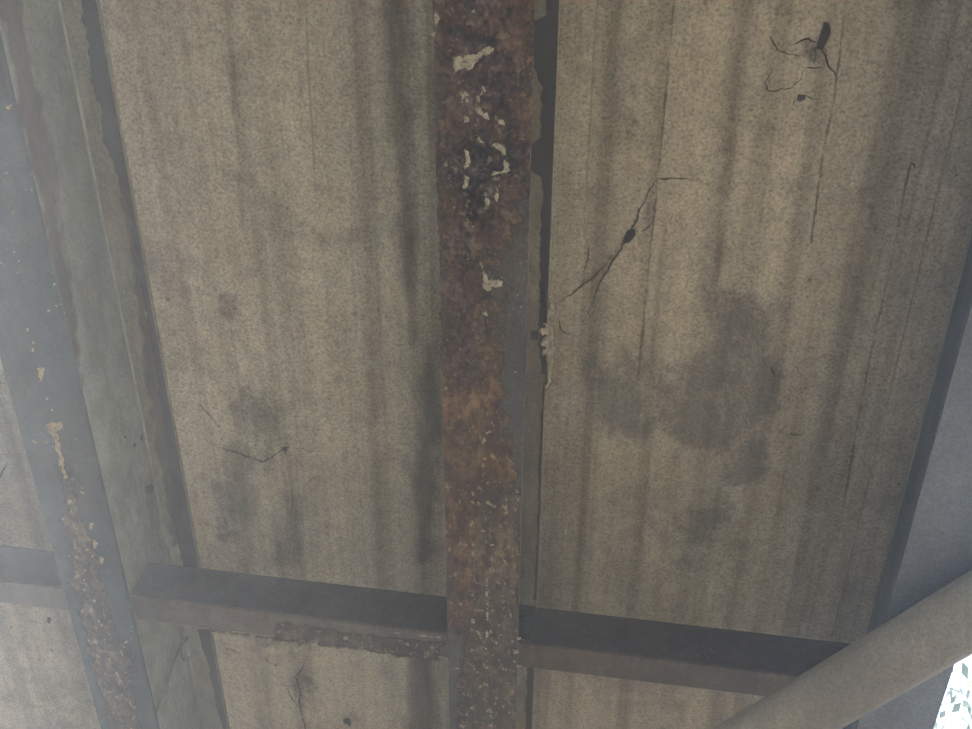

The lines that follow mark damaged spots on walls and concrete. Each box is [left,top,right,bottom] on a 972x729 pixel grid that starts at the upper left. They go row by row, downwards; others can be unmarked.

crack [764,22,837,107]
crack [559,177,693,335]
corrosion [273,315,521,729]
crack [265,655,314,729]